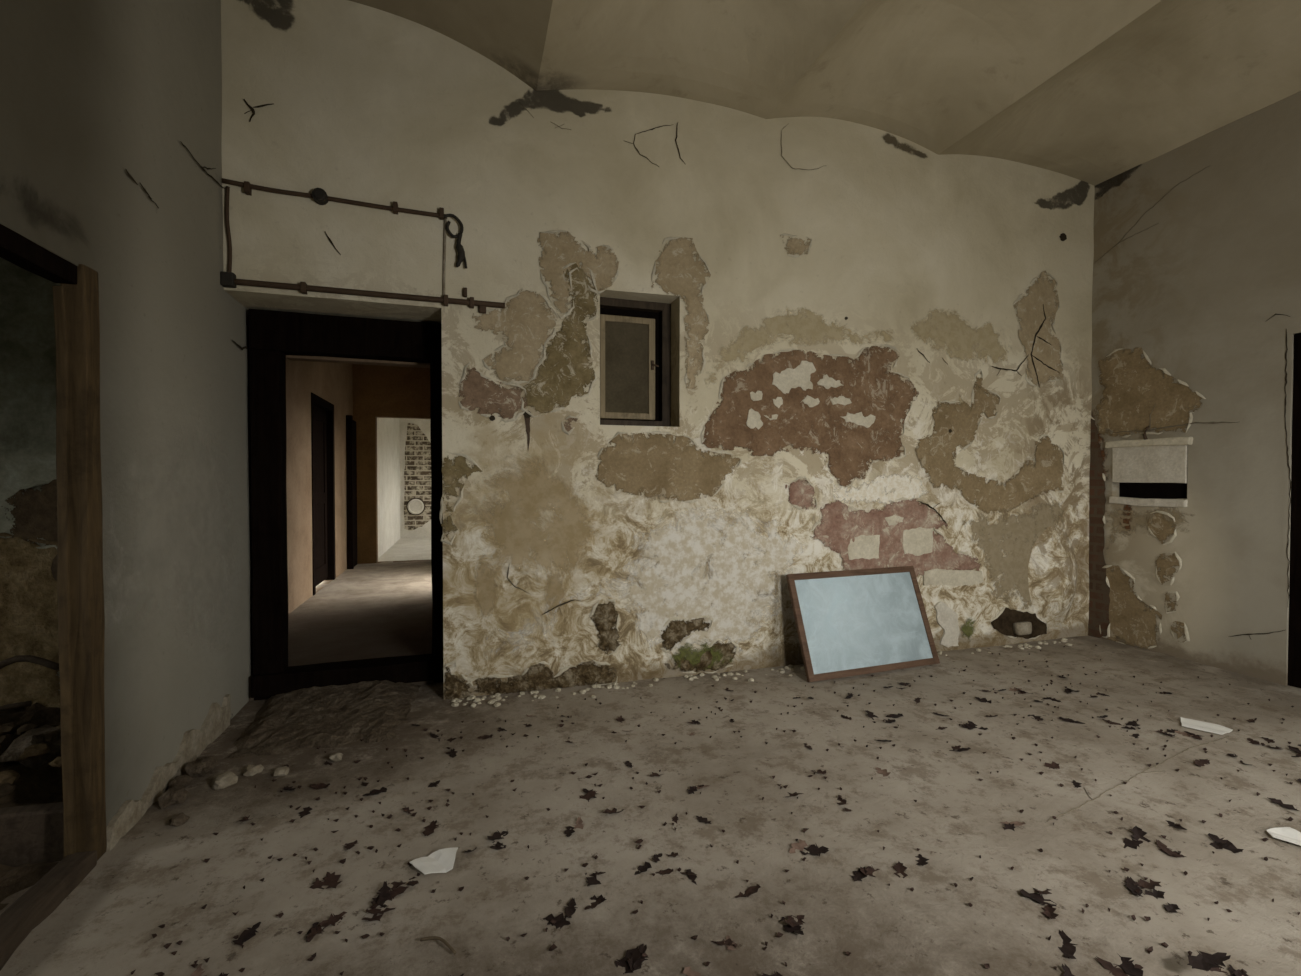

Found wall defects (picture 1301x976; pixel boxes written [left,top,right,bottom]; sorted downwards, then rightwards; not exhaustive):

crack [244,99,274,122]
crack [626,123,684,167]
flaking render [459,230,619,449]
flaking render [651,237,711,389]
crack [992,305,1057,388]
flaking render [1013,270,1064,387]
flaking render [595,344,1065,586]
flaking render [1088,347,1206,649]
flaking render [0,478,60,708]
flaking render [443,599,621,700]
flaking render [934,602,959,648]
spalling [990,606,1048,639]